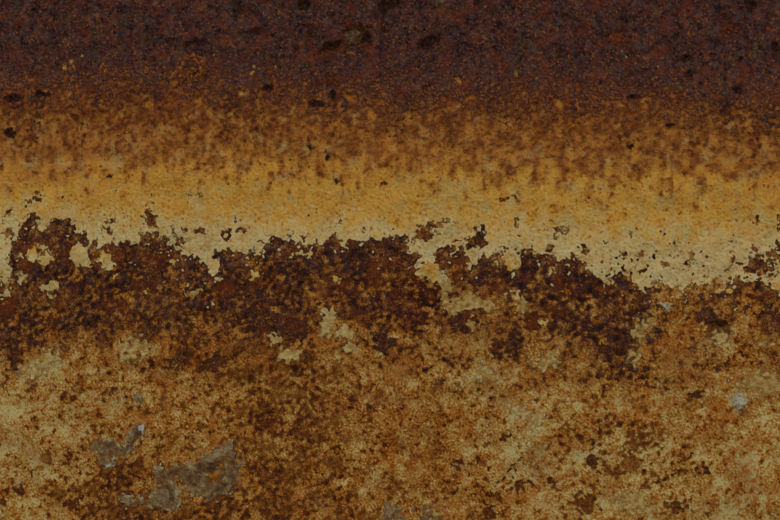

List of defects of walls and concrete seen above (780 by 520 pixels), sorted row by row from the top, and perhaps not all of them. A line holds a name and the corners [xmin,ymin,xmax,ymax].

rust [0,0,780,211]
peeling [0,54,780,332]
peeling [91,423,145,469]
peeling [118,438,241,513]
rust [0,190,780,520]